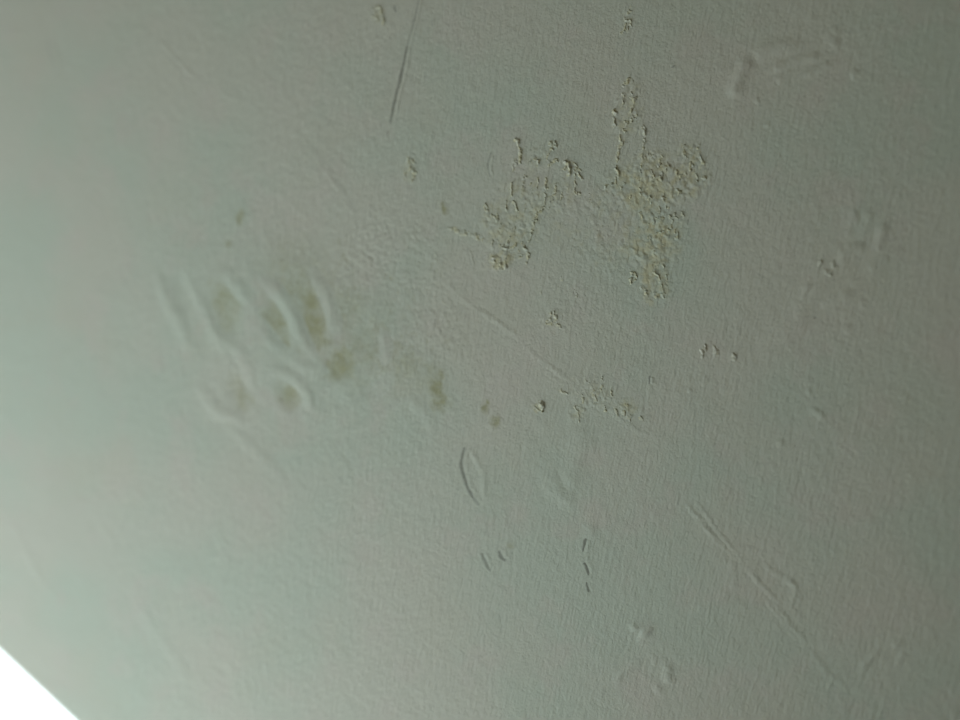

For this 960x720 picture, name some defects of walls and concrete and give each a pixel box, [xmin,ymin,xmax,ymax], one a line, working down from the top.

peeling [447,70,717,311]
leakage [257,295,306,358]
leakage [283,271,367,388]
leakage [222,363,303,421]